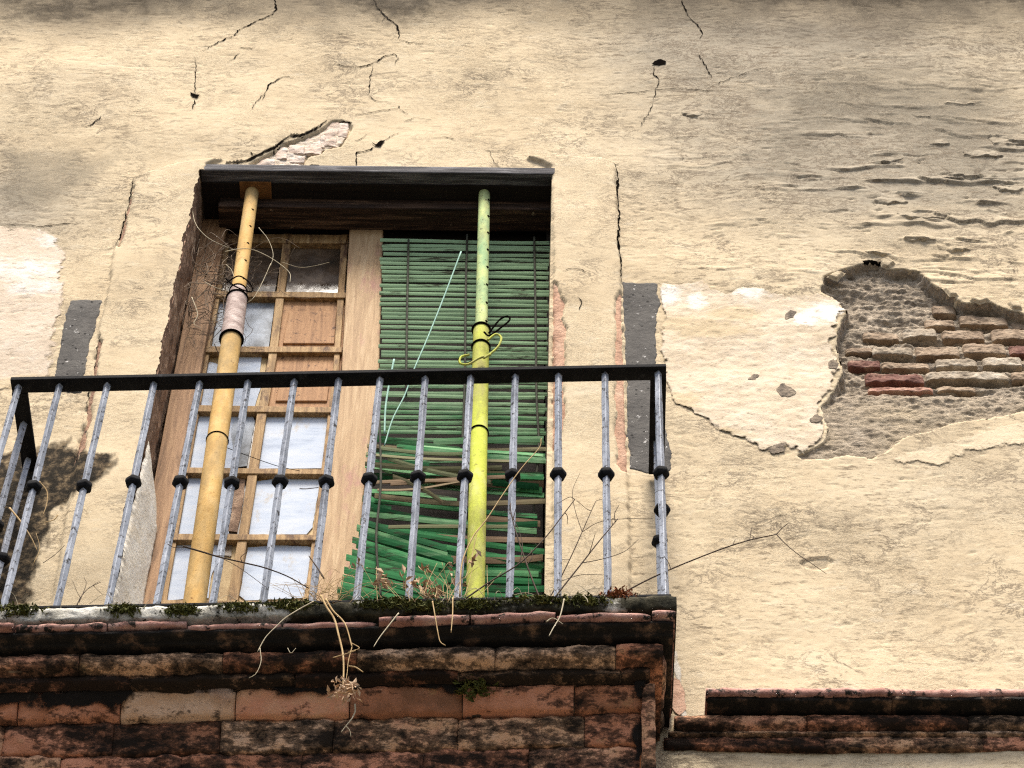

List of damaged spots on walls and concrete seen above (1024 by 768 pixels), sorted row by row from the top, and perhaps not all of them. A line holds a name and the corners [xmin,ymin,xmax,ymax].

crack [192,0,277,108]
crack [226,0,453,165]
crack [602,1,761,126]
spalling [256,122,349,165]
crack [117,174,150,241]
crack [614,164,622,279]
spalling [660,257,1024,465]